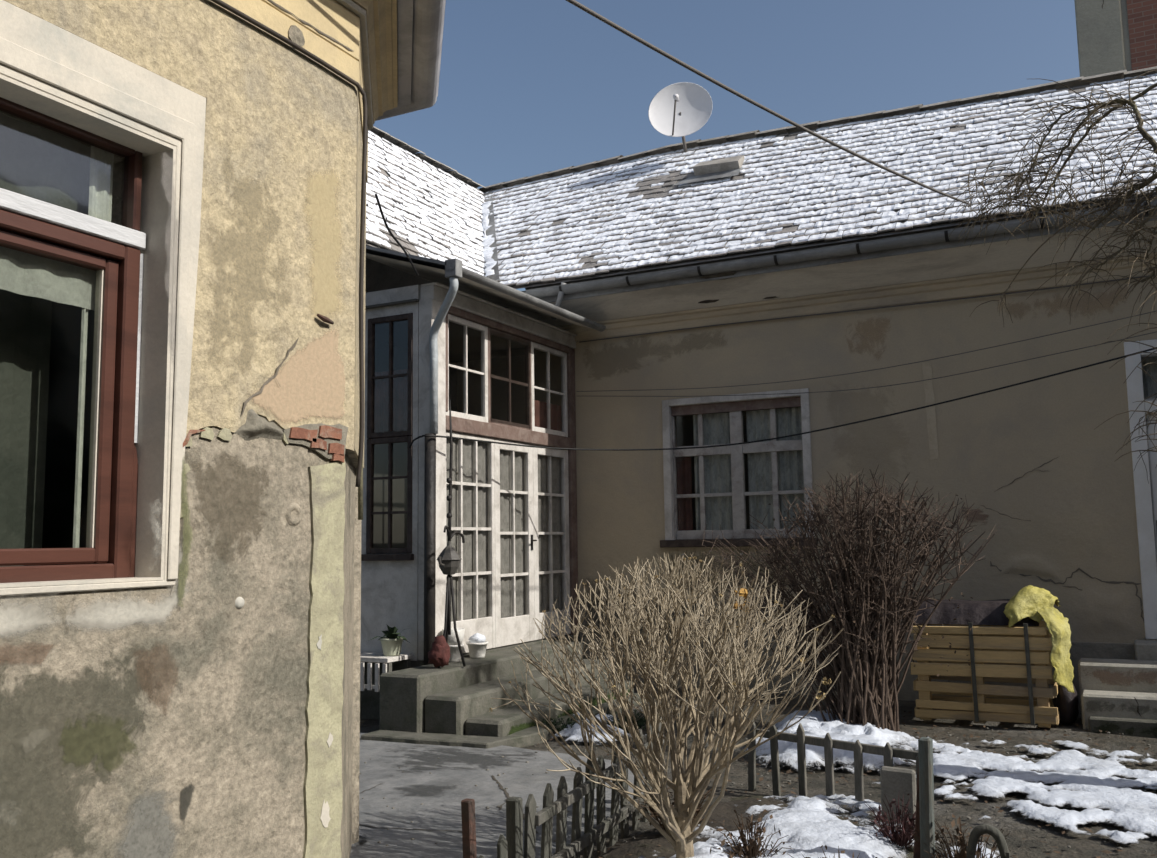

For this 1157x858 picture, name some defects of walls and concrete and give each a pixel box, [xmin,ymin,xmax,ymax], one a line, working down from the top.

crack [242,338,299,415]
crack [990,561,1144,621]
water stain [0,651,153,858]
water stain [119,784,194,858]